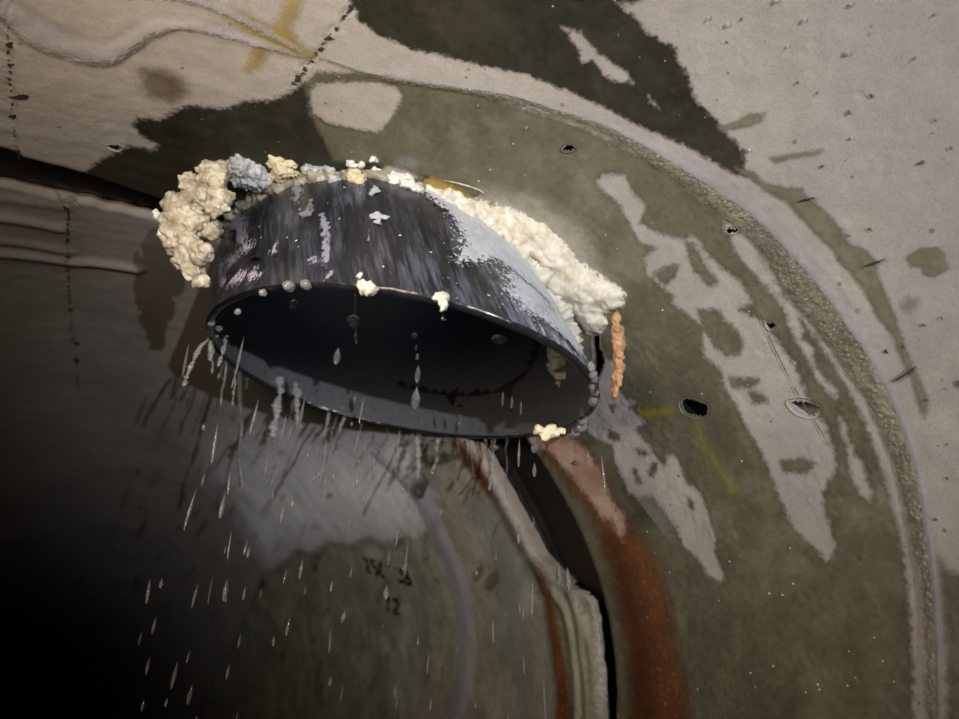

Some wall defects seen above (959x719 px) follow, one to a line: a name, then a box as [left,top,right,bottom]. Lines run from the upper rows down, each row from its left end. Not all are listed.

crack [5,25,29,158]
corrosion [454,437,495,496]
damp [81,71,915,719]
corrosion [537,436,687,719]
damp [351,0,927,418]
damp [908,247,948,276]